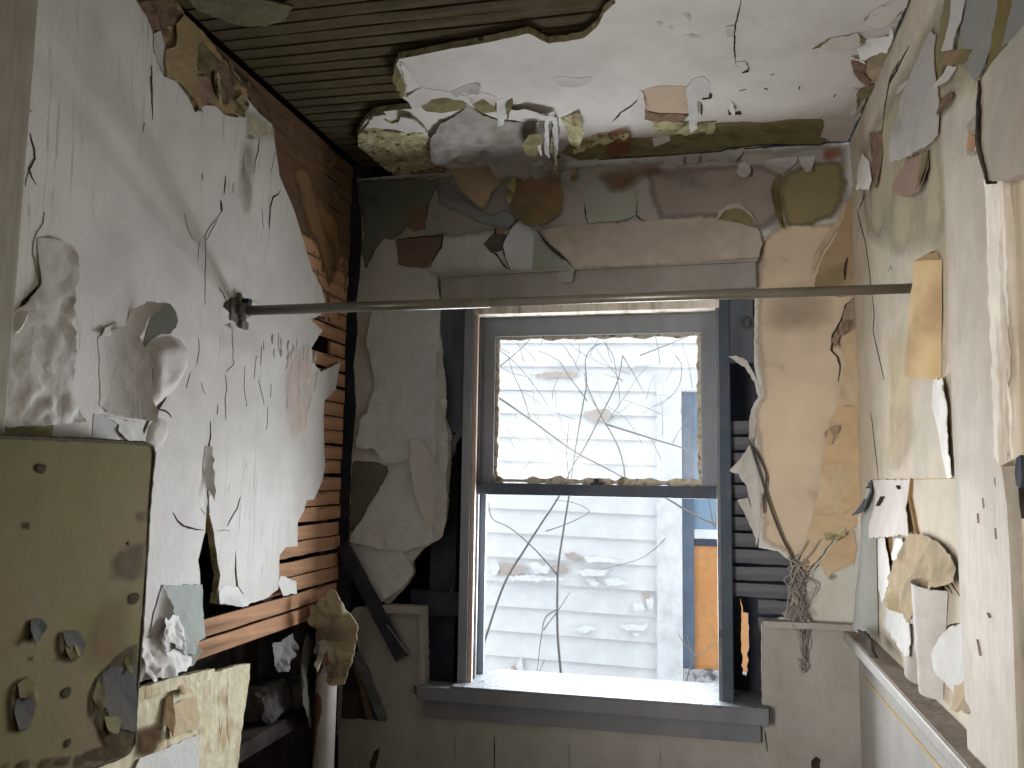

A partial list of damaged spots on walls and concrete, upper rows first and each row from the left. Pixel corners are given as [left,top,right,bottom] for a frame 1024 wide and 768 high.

crack [733,1,741,64]
flaking render [850,45,892,122]
crack [25,110,37,186]
spalling [966,115,976,157]
crack [184,137,280,304]
peeling [5,238,159,441]
flaking render [136,0,883,682]
peeling [932,377,952,479]
flaking render [884,533,956,700]